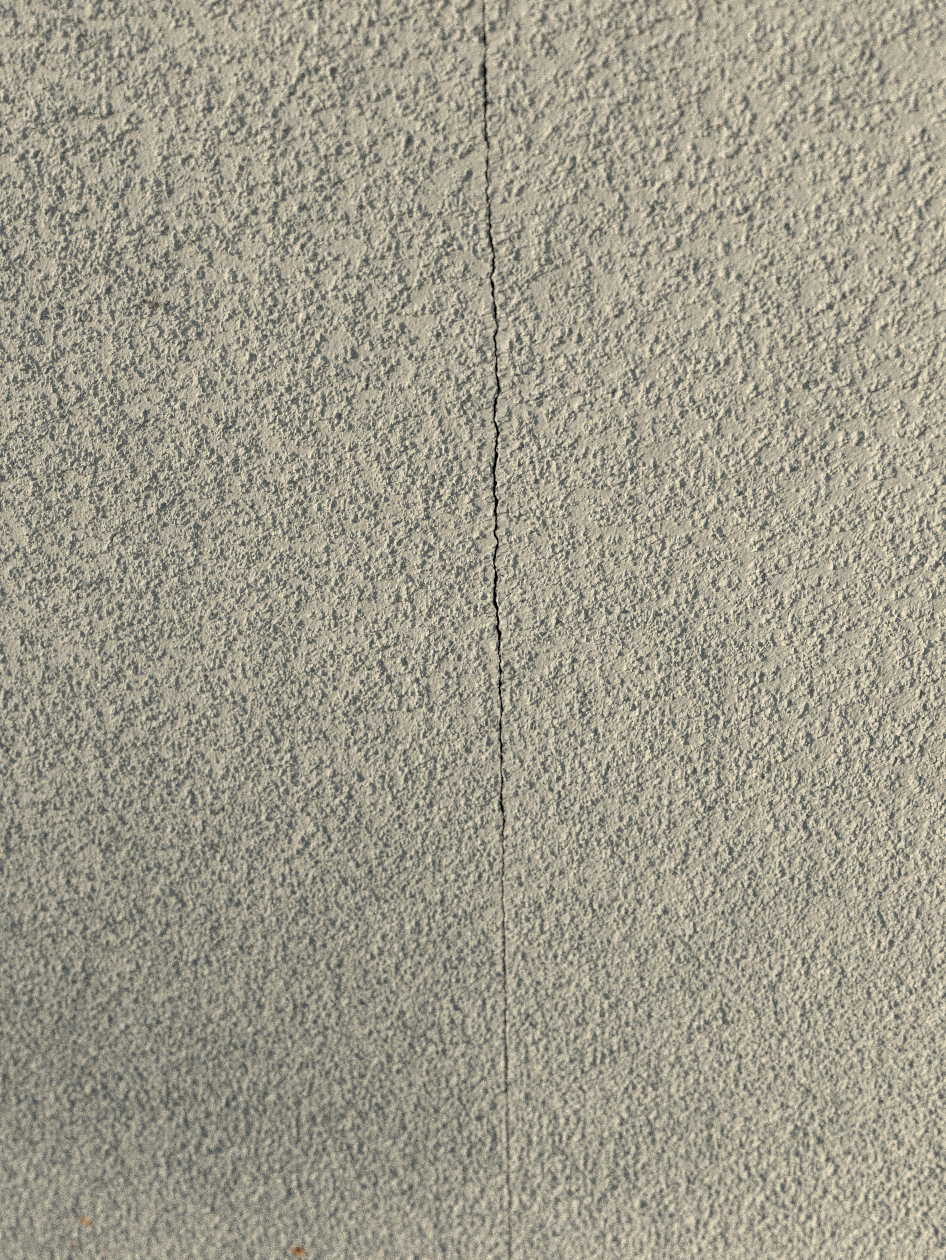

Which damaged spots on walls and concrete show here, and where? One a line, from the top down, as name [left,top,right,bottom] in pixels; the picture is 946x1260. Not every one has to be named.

crack [482,0,512,1260]